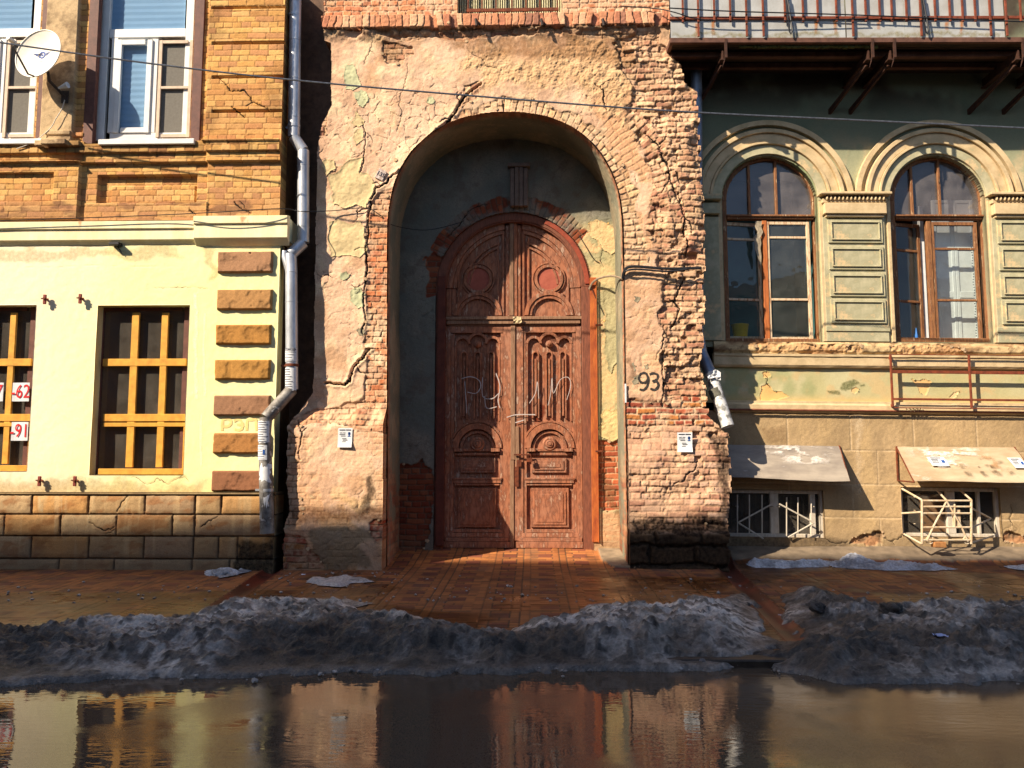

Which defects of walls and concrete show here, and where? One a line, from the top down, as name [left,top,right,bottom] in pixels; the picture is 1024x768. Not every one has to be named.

crack [221,80,268,117]
crack [436,90,473,130]
spalling [282,157,394,570]
crack [321,122,400,386]
spalling [368,21,732,573]
crack [646,134,692,252]
peeling [760,370,788,401]
water stain [630,435,842,573]